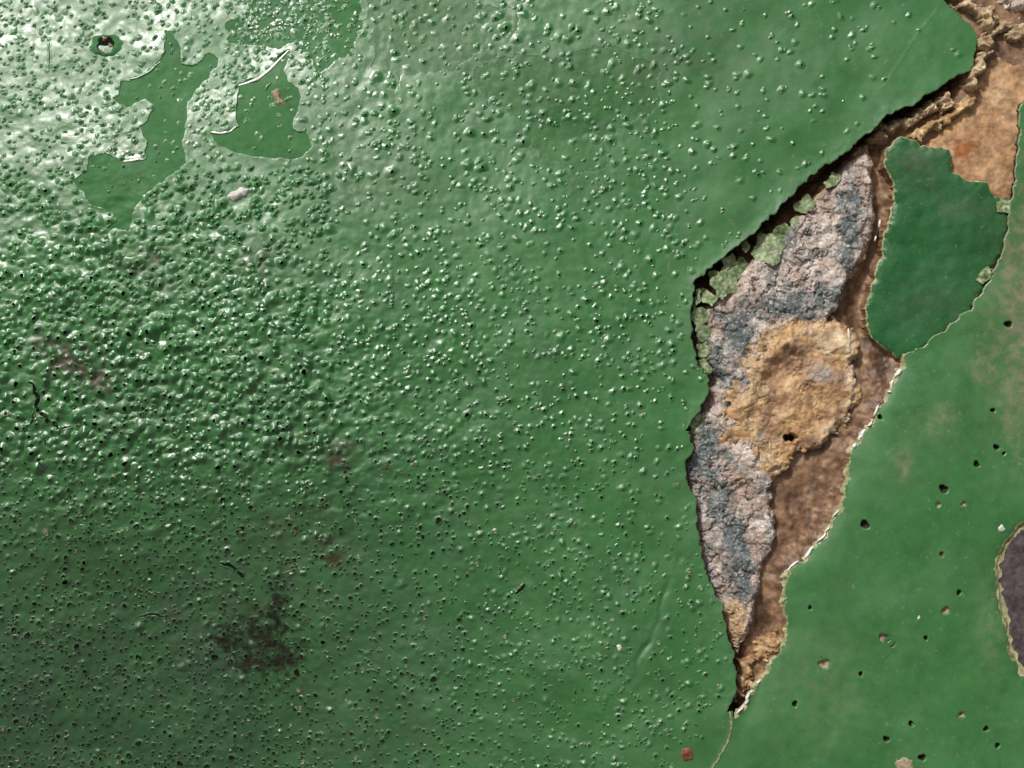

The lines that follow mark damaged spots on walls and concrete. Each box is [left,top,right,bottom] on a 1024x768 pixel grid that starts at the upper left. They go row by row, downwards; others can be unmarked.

peeling [74,31,218,232]
peeling [211,0,364,160]
crack [28,380,72,445]
spalling [685,0,1024,719]